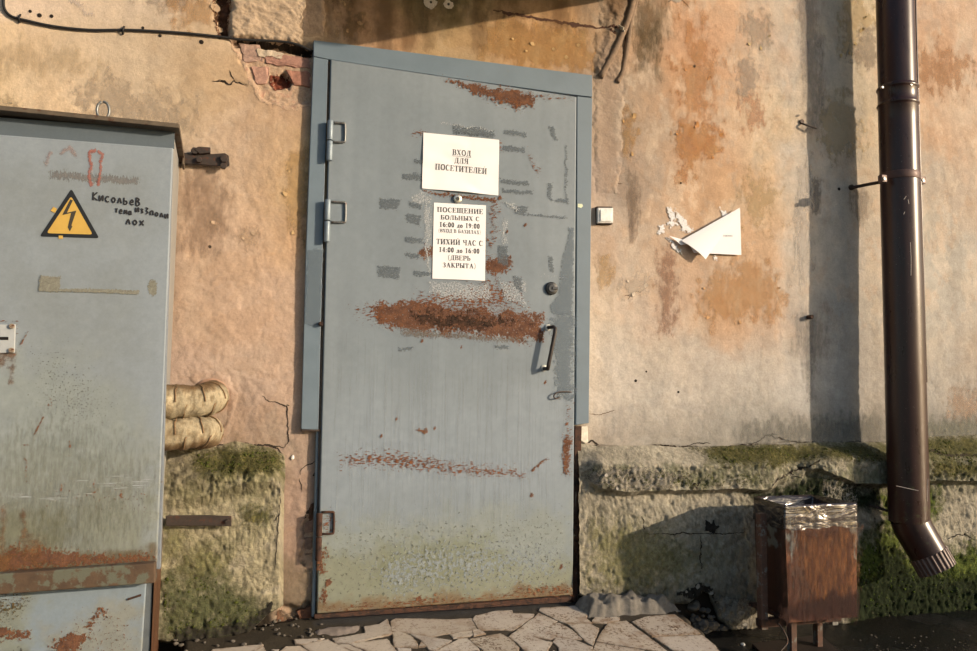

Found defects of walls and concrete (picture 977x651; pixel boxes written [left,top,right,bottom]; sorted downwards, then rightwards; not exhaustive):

spalling [167,0,313,111]
corrosion [442,74,575,112]
corrosion [348,190,545,348]
crack [248,397,289,454]
corrosion [339,402,575,480]
crack [654,433,825,486]
crack [275,461,315,565]
spalling [677,583,756,630]